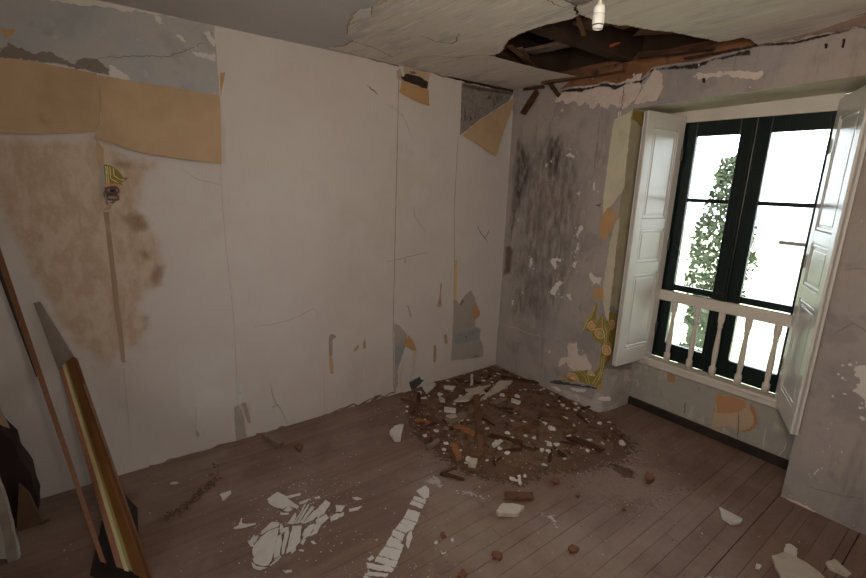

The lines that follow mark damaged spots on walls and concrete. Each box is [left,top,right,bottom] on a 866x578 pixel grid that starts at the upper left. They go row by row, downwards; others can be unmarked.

water stain [0,131,170,373]
peeling [0,0,225,164]
peeling [451,260,483,361]
mould [498,112,602,337]
spalling [558,341,592,371]
peeling [329,0,866,321]
spalling [831,362,866,421]